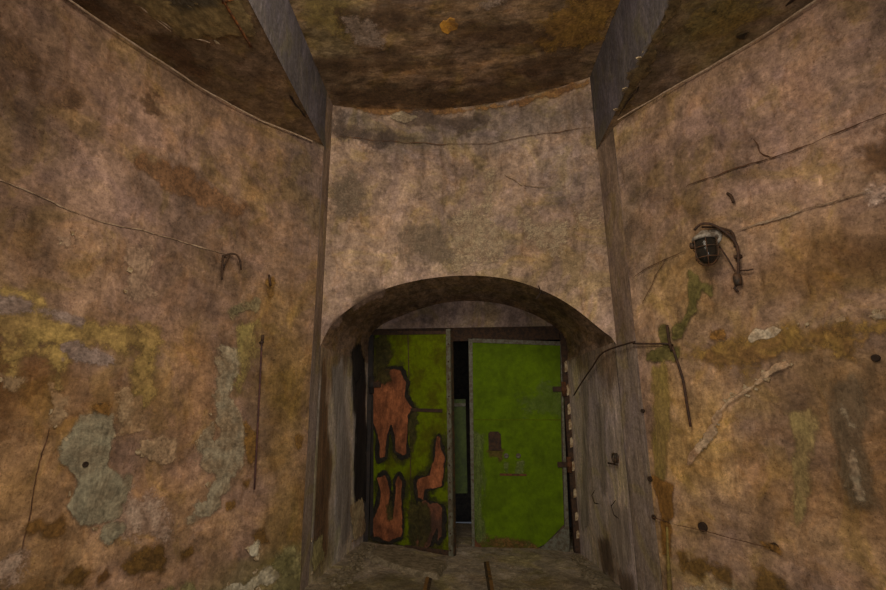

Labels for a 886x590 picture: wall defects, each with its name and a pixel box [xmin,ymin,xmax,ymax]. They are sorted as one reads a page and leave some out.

leakage [305,0,453,73]
leakage [330,0,620,148]
crack [687,113,886,186]
leakage [697,317,886,375]
leakage [828,374,876,508]